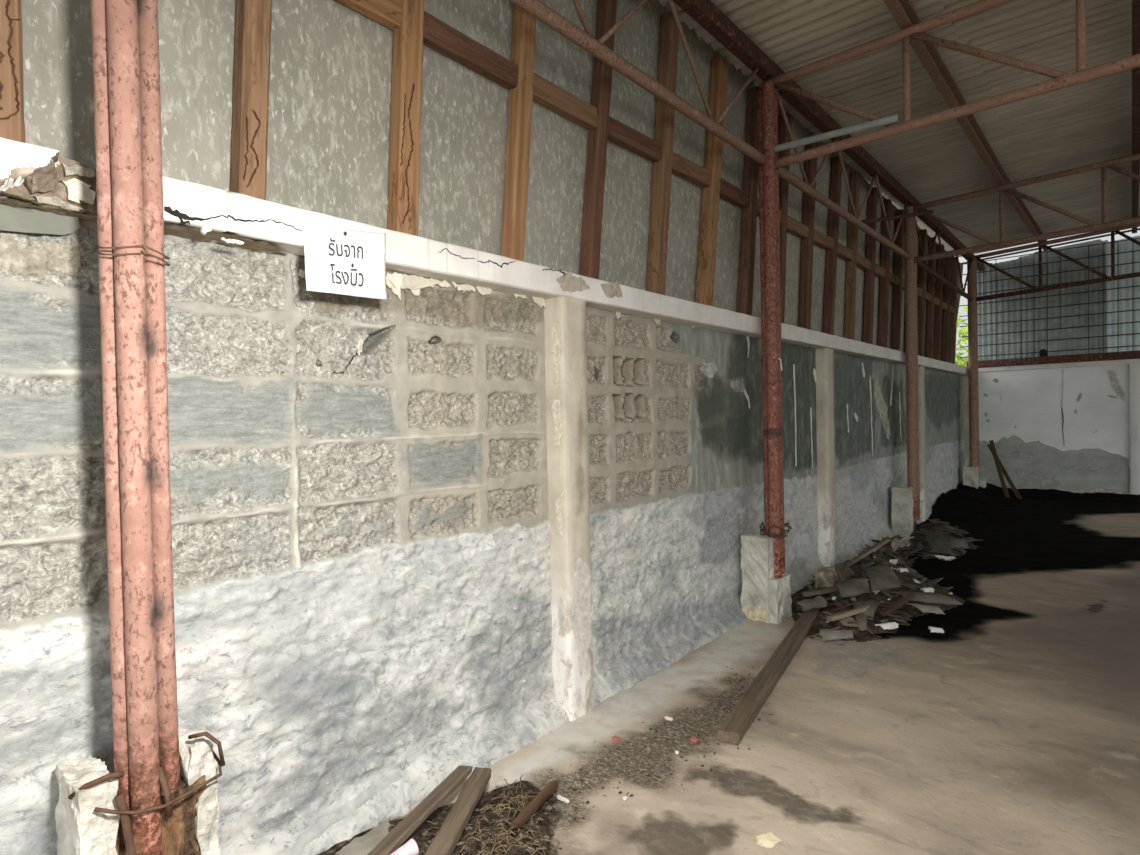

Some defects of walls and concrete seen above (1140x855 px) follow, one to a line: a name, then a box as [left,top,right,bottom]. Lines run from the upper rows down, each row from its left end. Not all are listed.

spalling [0,151,97,236]
crack [164,206,302,231]
crack [439,248,515,268]
peeling [318,272,546,324]
peeling [557,272,622,298]
spalling [356,325,396,356]
leakage [698,334,763,461]
leakage [781,342,817,469]
peeling [571,557,593,649]
rust [115,810,142,855]
rust [161,774,206,855]